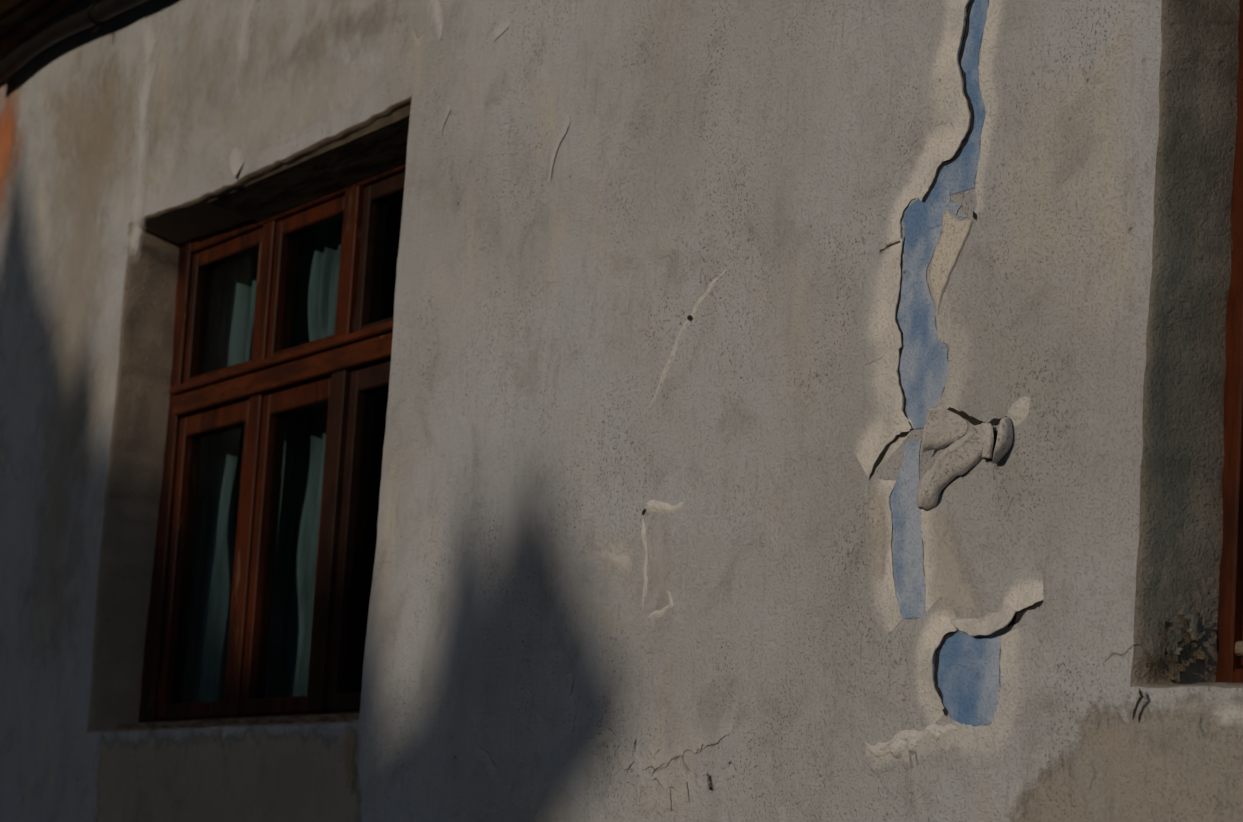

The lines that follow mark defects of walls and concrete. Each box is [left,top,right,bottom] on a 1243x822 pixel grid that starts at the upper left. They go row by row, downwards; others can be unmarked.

crack [644,269,727,414]
peeling [907,569,1044,770]
crack [619,710,737,819]